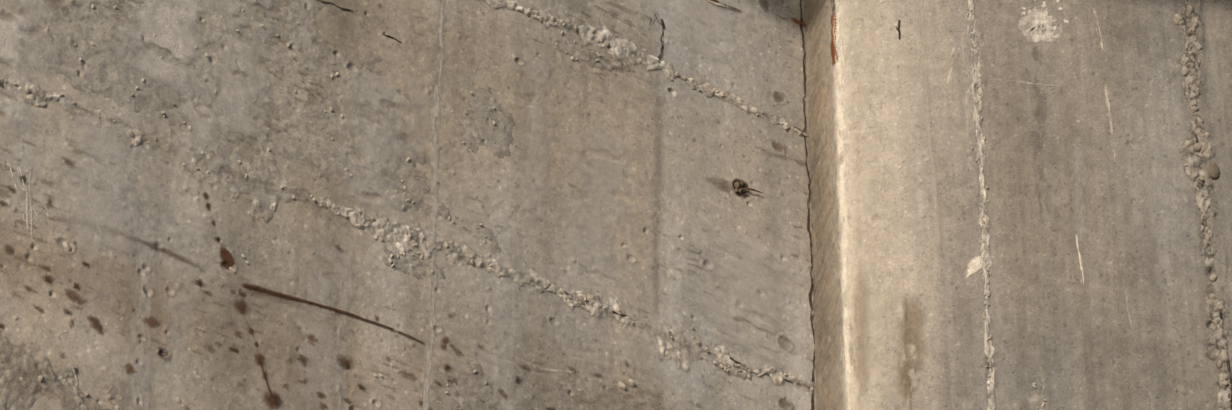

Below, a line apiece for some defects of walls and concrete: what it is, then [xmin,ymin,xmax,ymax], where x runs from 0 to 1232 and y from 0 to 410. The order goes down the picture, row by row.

damp [833,0,886,410]